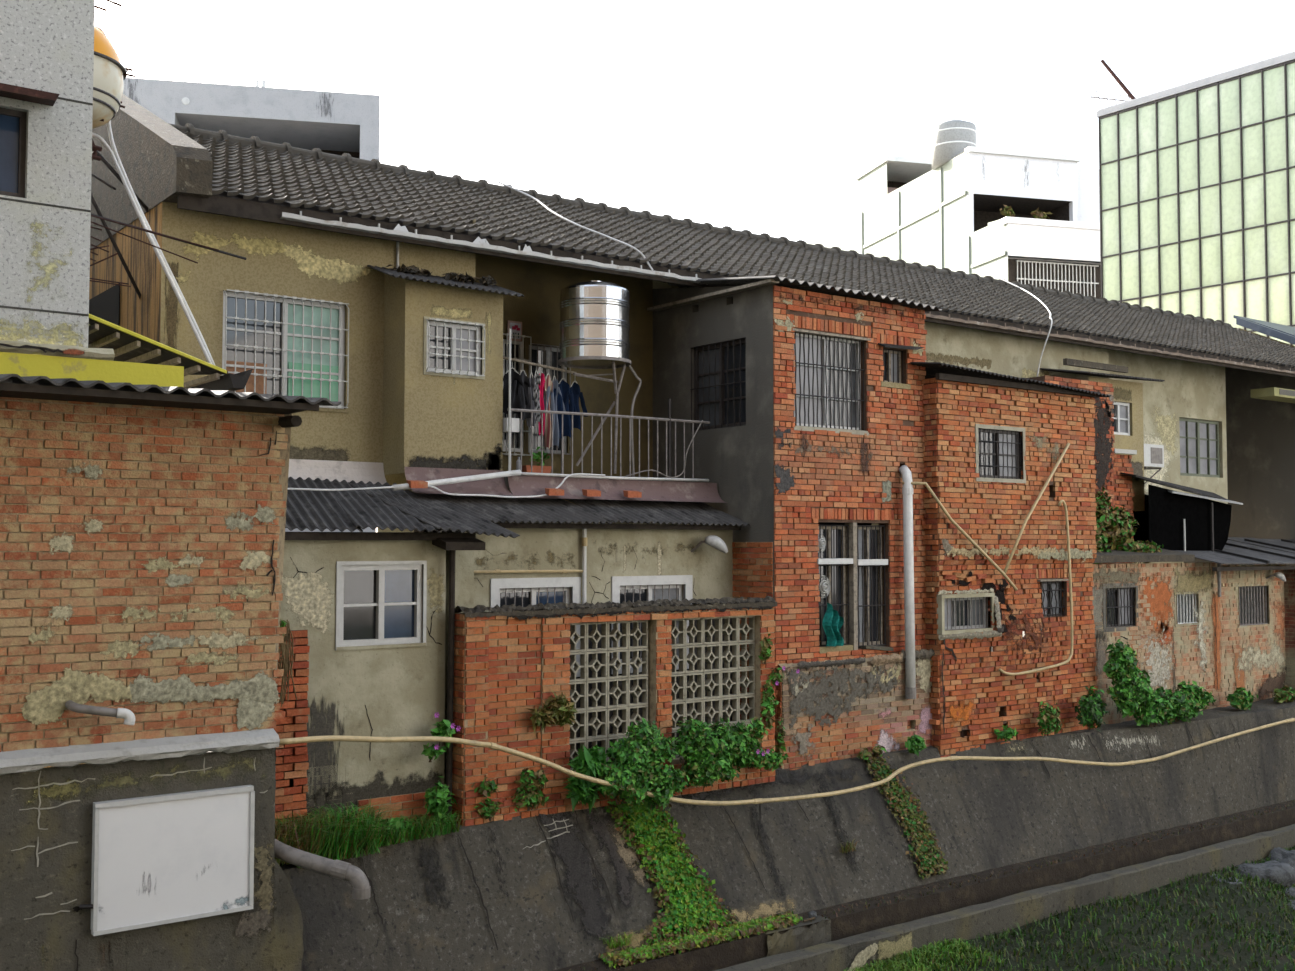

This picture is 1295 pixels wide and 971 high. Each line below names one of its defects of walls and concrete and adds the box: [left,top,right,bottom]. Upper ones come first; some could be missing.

damp [27,223,72,302]
damp [0,318,83,347]
crack [589,549,637,605]